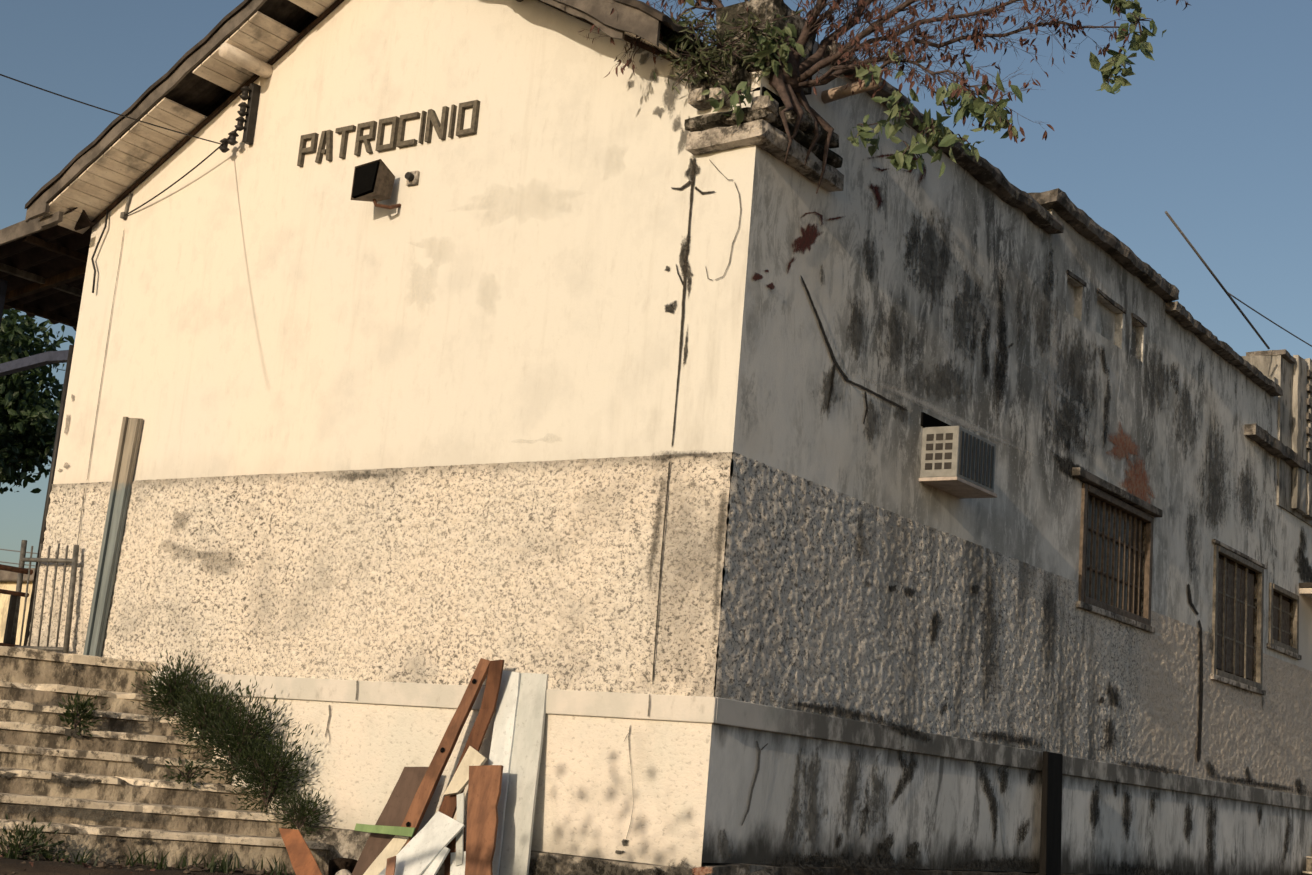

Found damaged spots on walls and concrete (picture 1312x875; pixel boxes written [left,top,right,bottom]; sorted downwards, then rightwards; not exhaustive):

leakage [847,211,1111,487]
leakage [339,471,385,481]
leakage [648,480,664,584]
crack [624,158,741,839]
leakage [652,452,717,461]
spalling [1110,422,1155,503]
leakage [1145,351,1260,579]
leakage [1296,528,1312,583]
leakage [7,804,168,822]
leakage [756,701,1045,875]
leakage [1090,682,1182,842]
leakage [1108,761,1312,875]